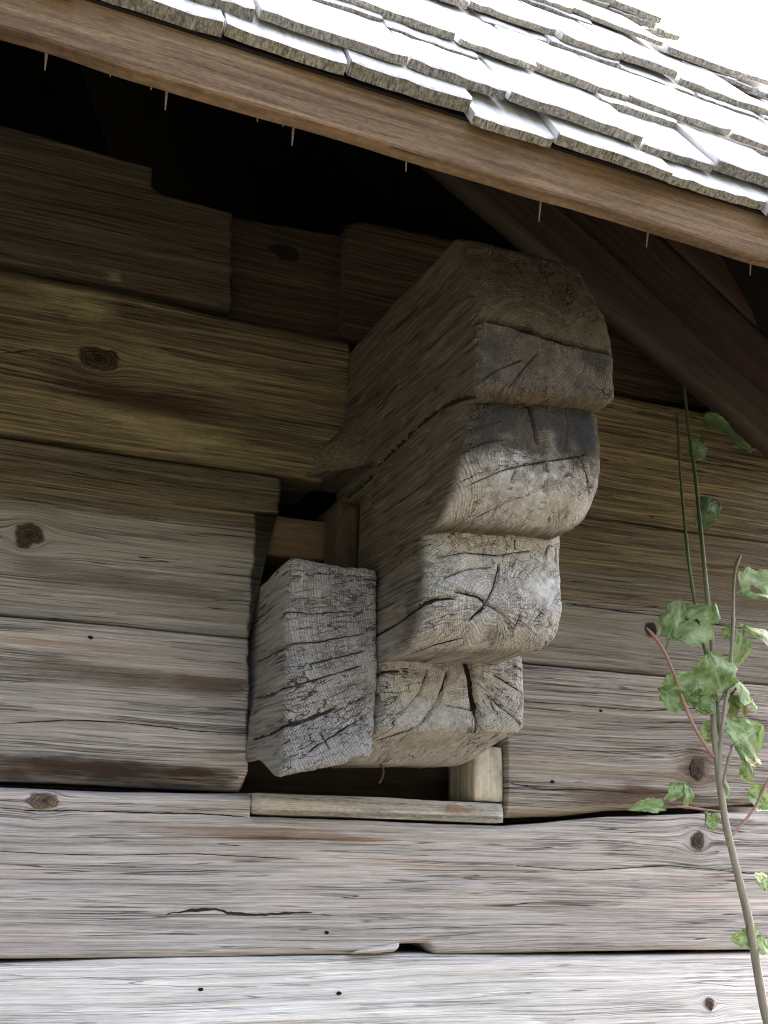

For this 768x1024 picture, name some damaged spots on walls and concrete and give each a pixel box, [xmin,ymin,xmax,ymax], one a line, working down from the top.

crack [348,322,583,498]
crack [466,455,588,518]
crack [257,541,740,740]
crack [168,908,312,916]